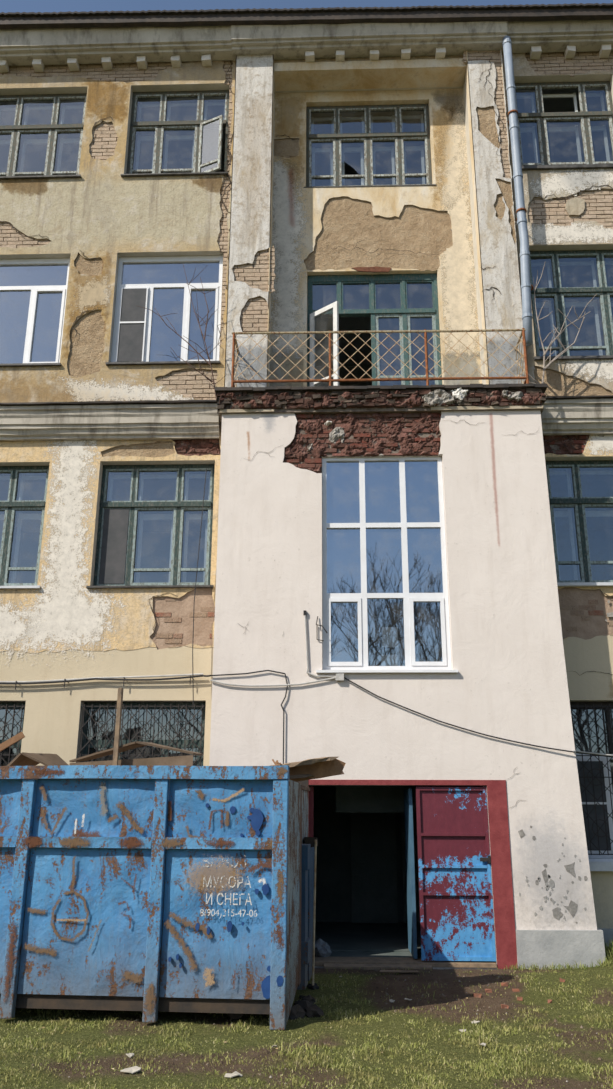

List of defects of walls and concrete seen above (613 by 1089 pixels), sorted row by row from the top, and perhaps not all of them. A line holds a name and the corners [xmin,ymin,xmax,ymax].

flaking render [0,221,51,248]
flaking render [60,50,613,473]
peeling [0,439,221,663]
flaking render [558,587,613,640]